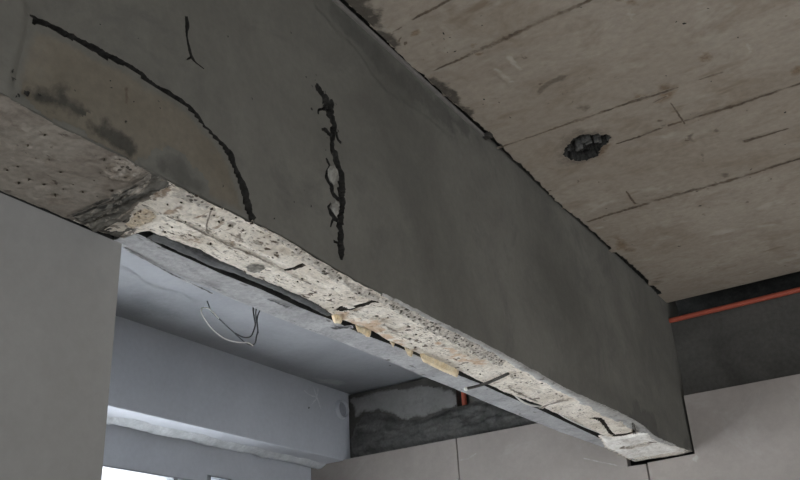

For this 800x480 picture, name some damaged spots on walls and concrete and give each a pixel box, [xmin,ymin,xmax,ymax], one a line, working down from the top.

crack [29,14,256,223]
spalling [68,153,237,238]
crack [304,75,346,260]
spalling [563,133,611,161]
spalling [245,222,507,368]
spalling [598,432,685,459]